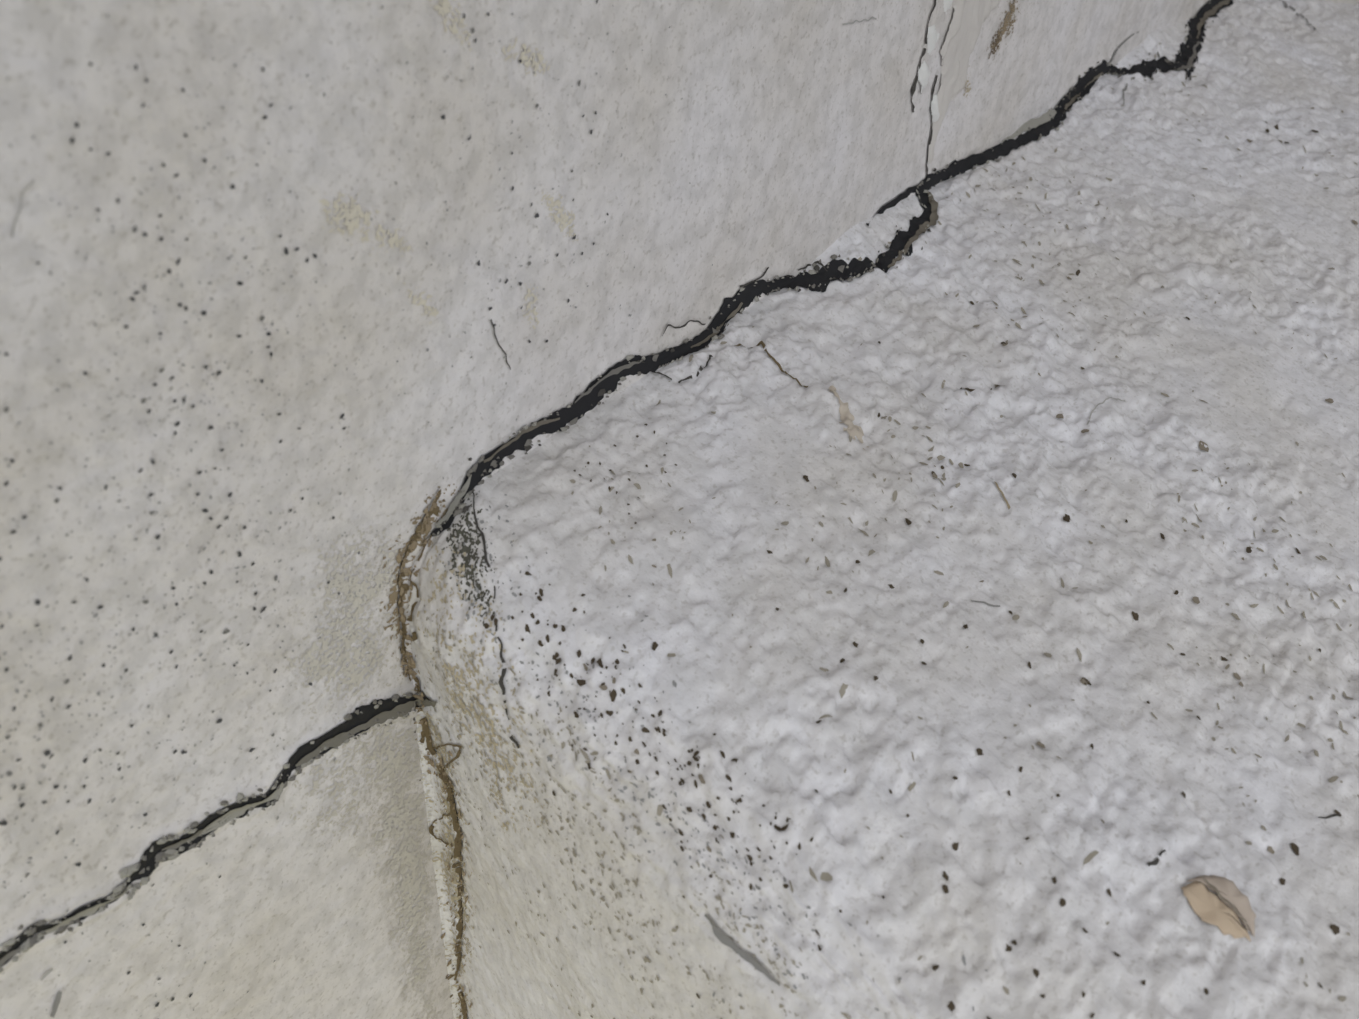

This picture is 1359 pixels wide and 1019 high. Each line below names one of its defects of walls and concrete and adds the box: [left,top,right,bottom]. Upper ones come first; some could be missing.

crack [1281,0,1317,30]
crack [11,179,35,237]
crack [402,0,1233,567]
damp [278,515,415,719]
crack [971,599,1000,607]
crack [495,625,520,749]
crack [0,568,467,1019]
damp [289,710,458,1019]
crack [1147,850,1166,866]